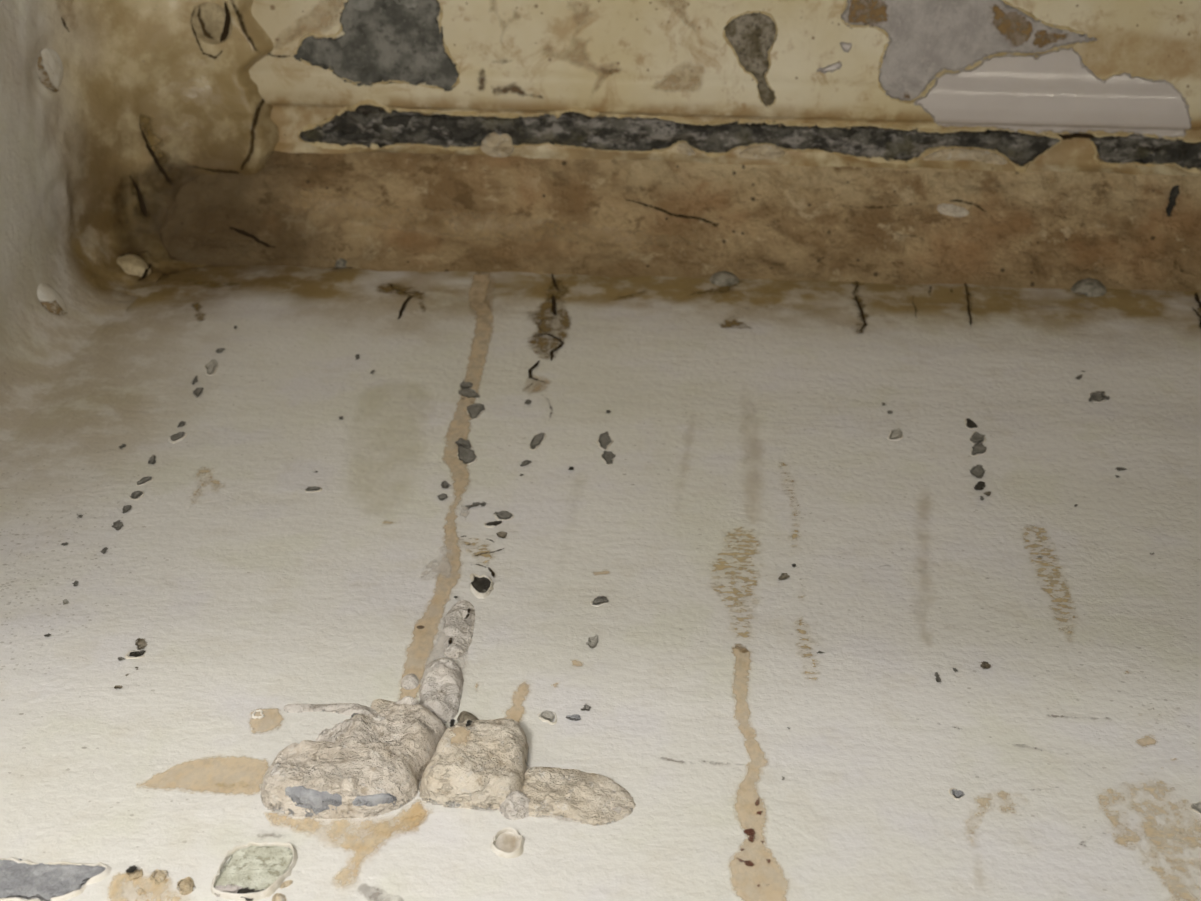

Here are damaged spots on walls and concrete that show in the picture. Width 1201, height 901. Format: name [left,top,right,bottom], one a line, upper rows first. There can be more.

crack [191,0,287,59]
peeling [293,0,460,91]
spalling [723,11,778,107]
peeling [840,0,1192,139]
crack [129,99,265,218]
crack [1058,132,1094,140]
crack [230,227,275,248]
crack [1193,292,1201,328]
leakage [145,273,636,826]
leakage [713,529,787,901]
peeling [0,857,112,901]
spalling [211,841,298,901]